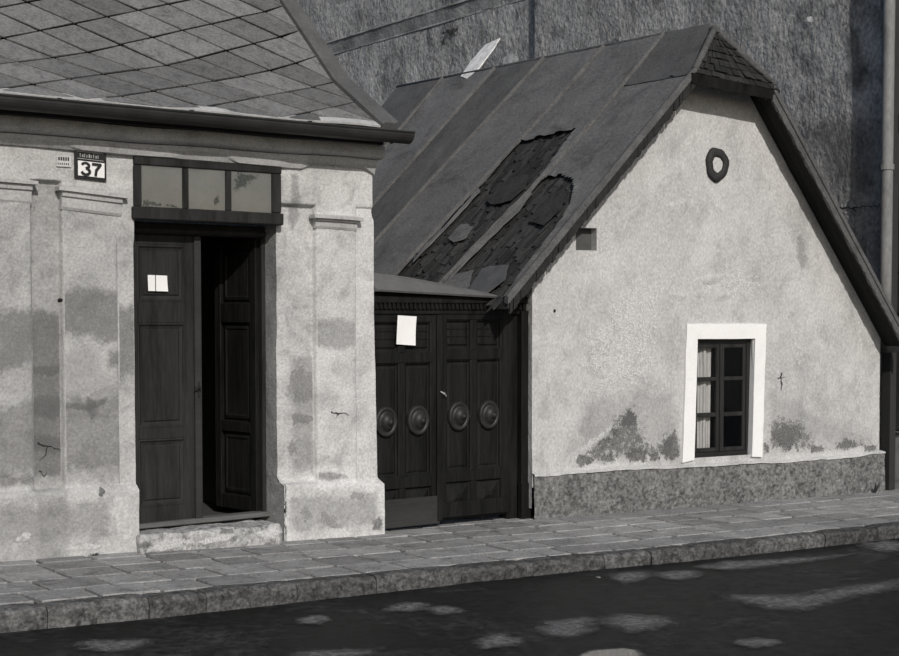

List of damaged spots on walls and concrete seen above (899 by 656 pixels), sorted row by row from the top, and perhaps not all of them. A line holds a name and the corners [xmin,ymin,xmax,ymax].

damp [0,290,134,474]
peeling [567,405,680,471]
peeling [764,417,877,453]